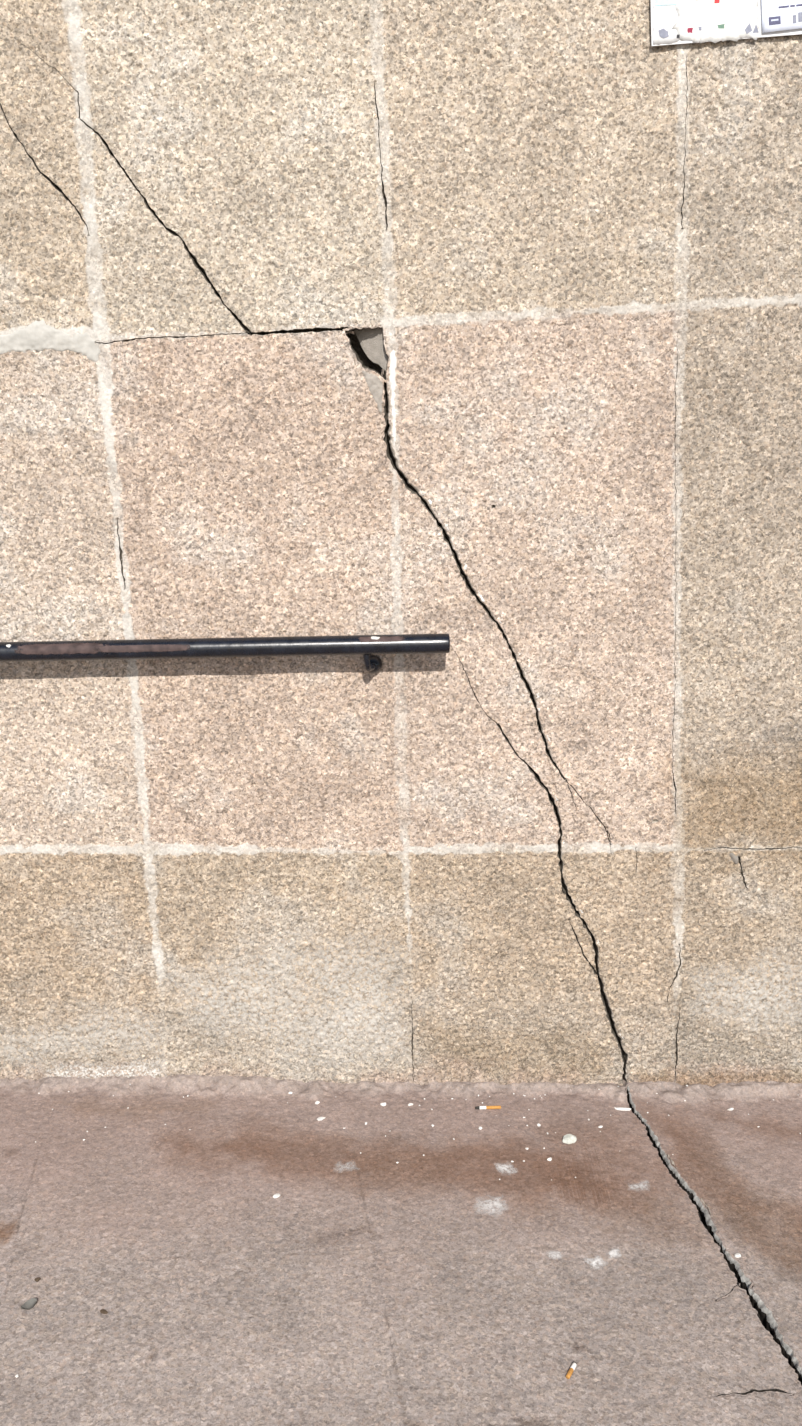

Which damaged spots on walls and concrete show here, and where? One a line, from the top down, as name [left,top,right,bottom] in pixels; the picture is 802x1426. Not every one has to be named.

crack [0,99,90,235]
crack [18,40,354,345]
crack [373,82,389,230]
crack [679,56,689,228]
spalling [343,326,390,413]
crack [116,519,127,589]
crack [381,350,639,1086]
crack [666,944,682,1083]